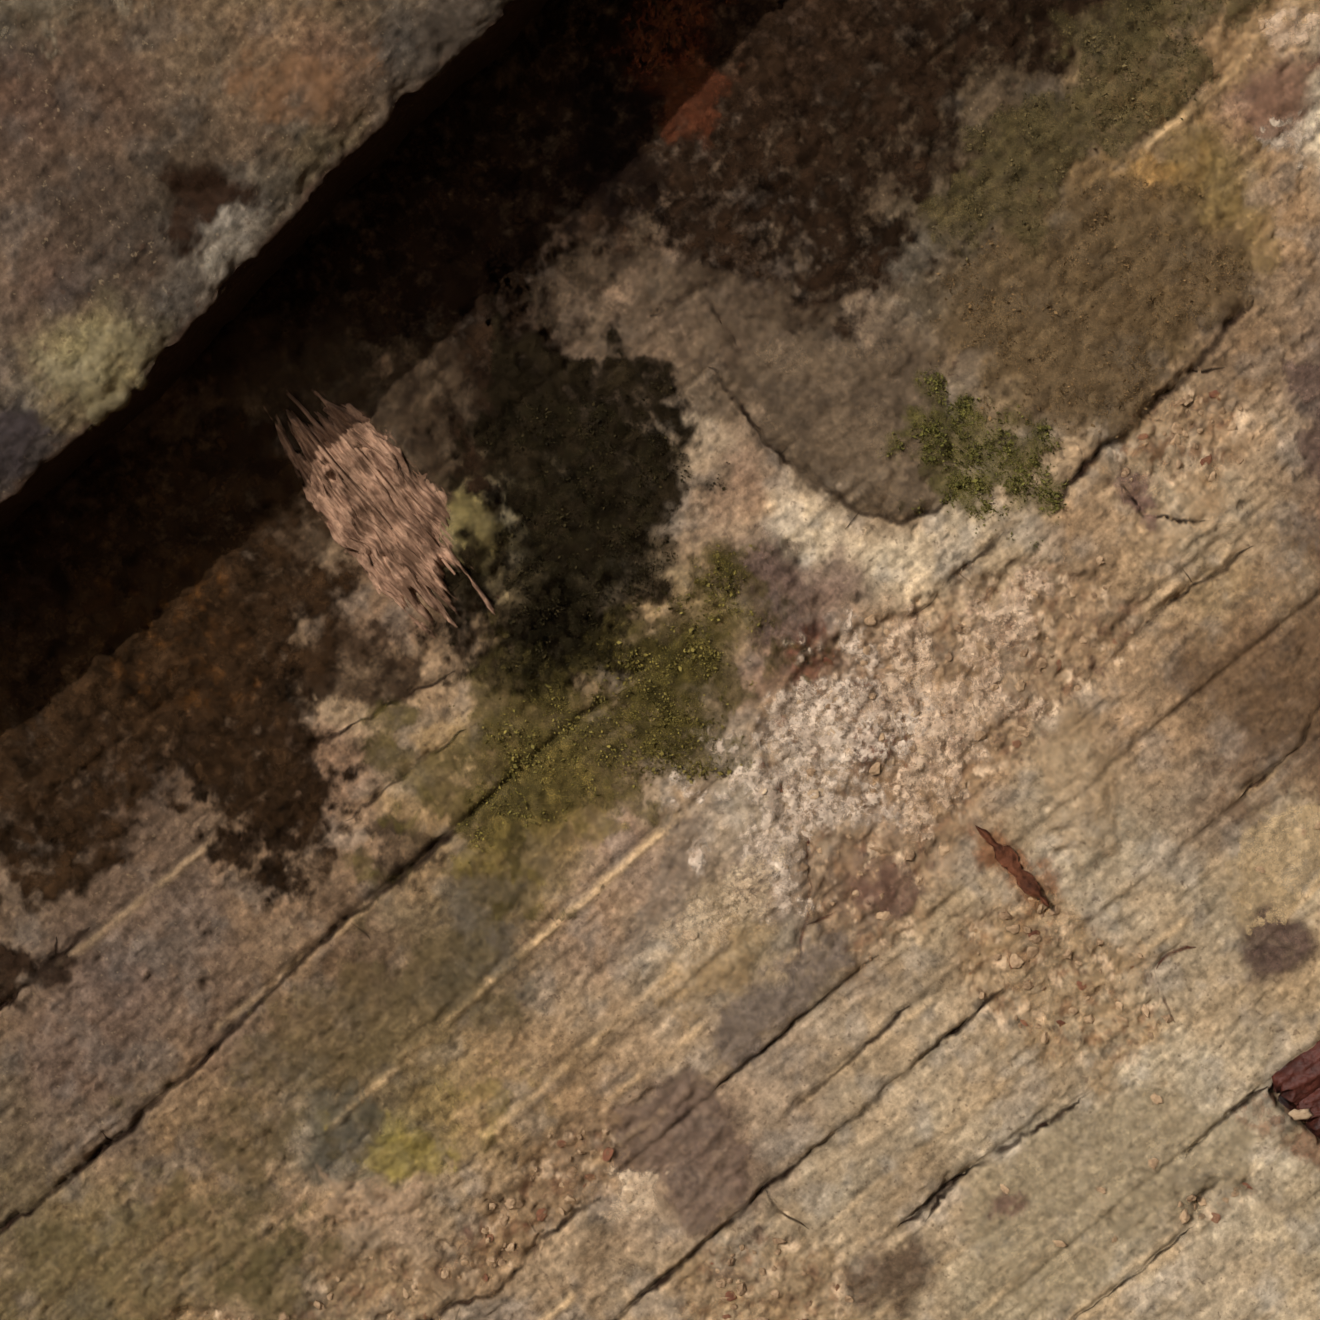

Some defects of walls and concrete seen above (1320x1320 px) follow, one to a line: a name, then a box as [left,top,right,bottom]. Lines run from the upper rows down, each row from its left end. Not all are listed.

damp [0,408,369,912]
crack [0,690,624,1234]
crack [712,955,878,1092]
crack [811,1006,909,1094]
crack [935,990,1001,1047]
crack [727,1152,810,1228]
crack [614,1251,697,1320]